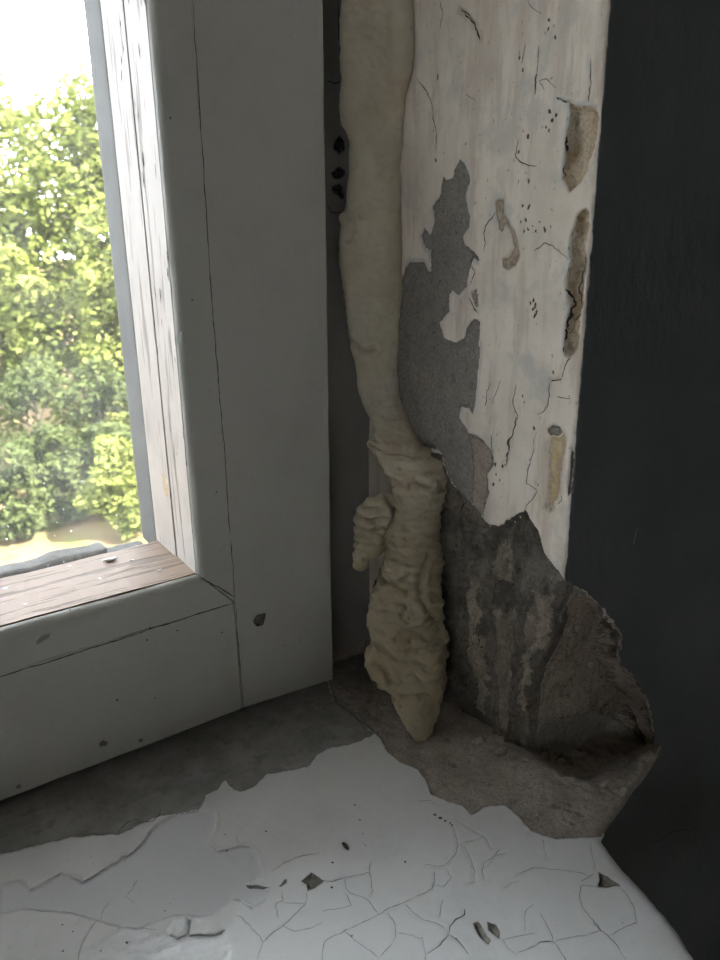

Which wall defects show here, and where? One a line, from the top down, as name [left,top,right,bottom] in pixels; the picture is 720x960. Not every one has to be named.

crack [440,2,480,40]
crack [519,46,555,93]
crack [460,213,495,313]
crack [525,358,571,510]
spalling [0,143,662,960]
crack [240,819,637,960]